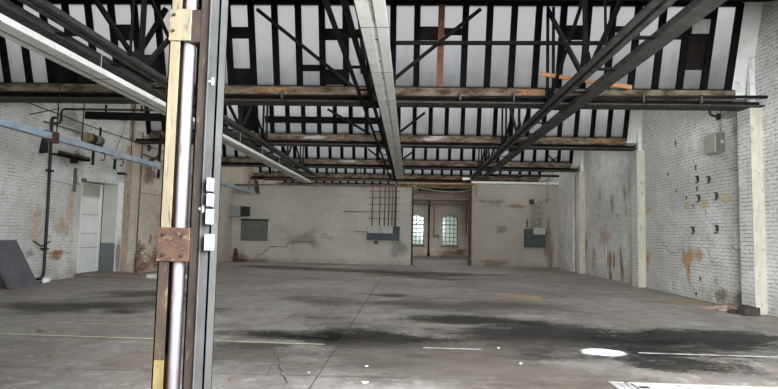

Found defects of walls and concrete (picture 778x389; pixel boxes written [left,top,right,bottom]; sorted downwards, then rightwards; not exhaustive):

peeling [133,237,158,273]
water stain [213,339,646,389]